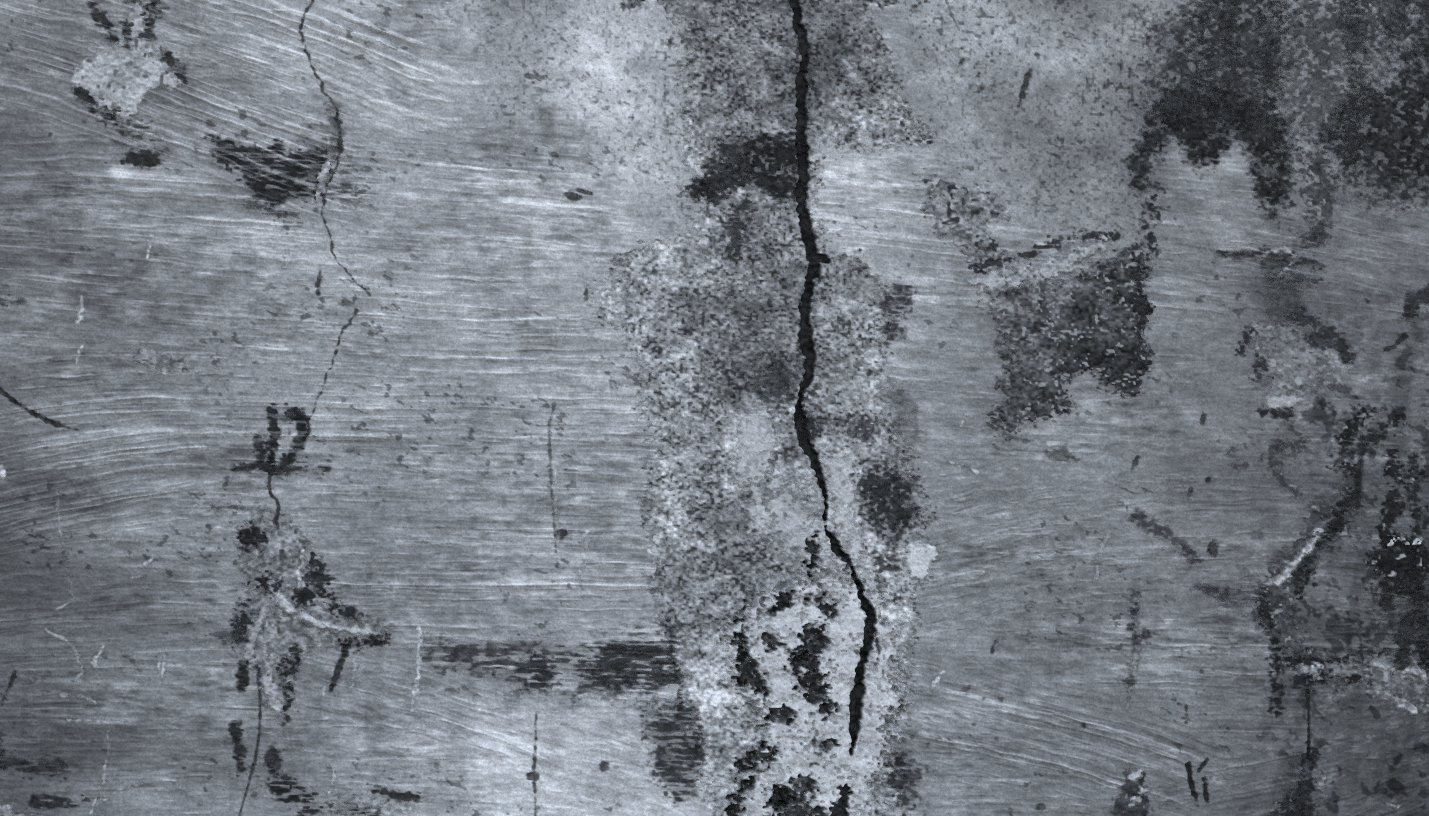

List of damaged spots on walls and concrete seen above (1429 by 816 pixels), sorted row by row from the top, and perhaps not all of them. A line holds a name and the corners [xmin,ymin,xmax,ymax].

crack [268,471,280,561]
leakage [231,403,331,475]
crack [299,0,370,437]
spalling [564,188,592,201]
spalling [584,0,938,816]
crack [789,0,880,816]
spalling [920,179,1161,445]
leakage [1122,0,1429,242]
leakage [1326,404,1429,675]
leakage [235,660,249,691]
crack [240,594,384,812]
leakage [264,747,420,816]